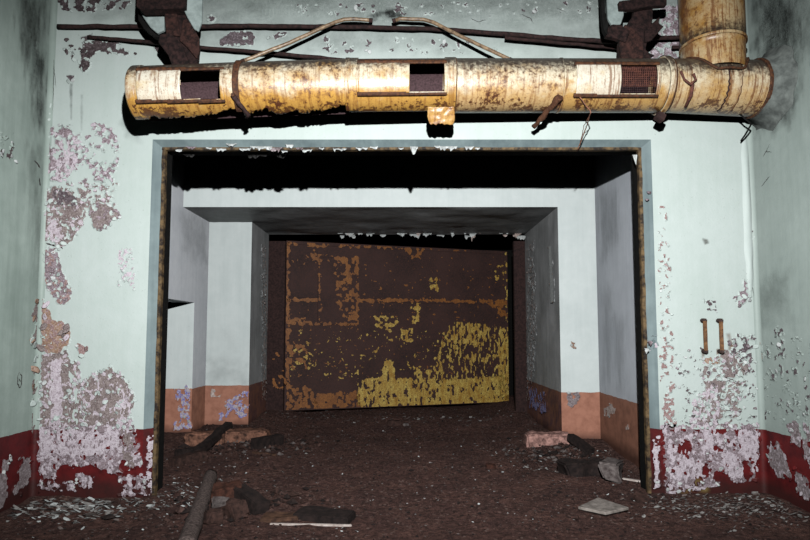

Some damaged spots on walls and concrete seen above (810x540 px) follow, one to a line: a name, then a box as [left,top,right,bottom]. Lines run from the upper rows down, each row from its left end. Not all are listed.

spalling [63,33,137,84]
peeling [218,30,256,47]
peeling [206,143,346,159]
peeling [0,122,202,532]
peeling [620,205,810,532]